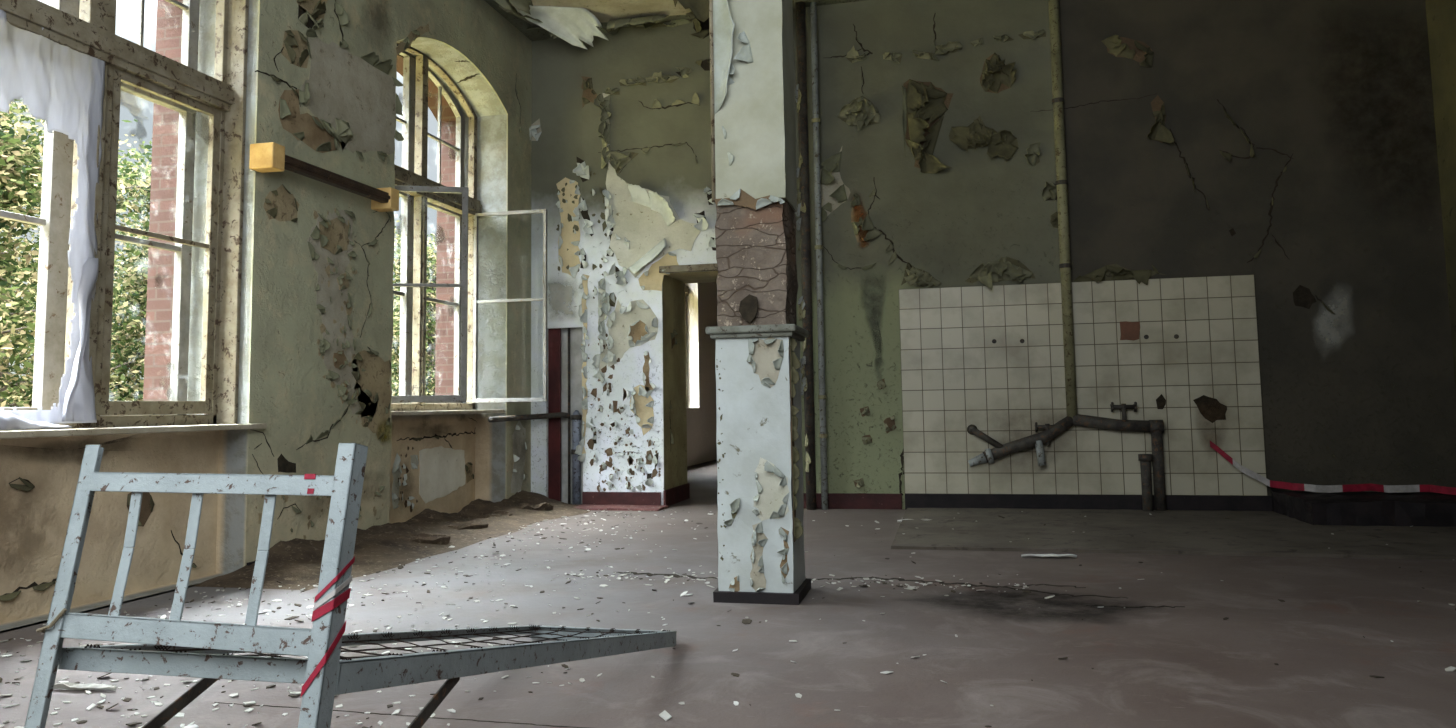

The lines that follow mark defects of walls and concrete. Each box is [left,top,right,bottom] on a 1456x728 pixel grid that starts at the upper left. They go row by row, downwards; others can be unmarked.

flaking render [278,0,432,162]
peeling [902,79,1040,173]
peeling [980,29,1046,93]
peeling [1042,182,1058,228]
flaking render [263,184,392,440]
flaking render [494,0,870,593]